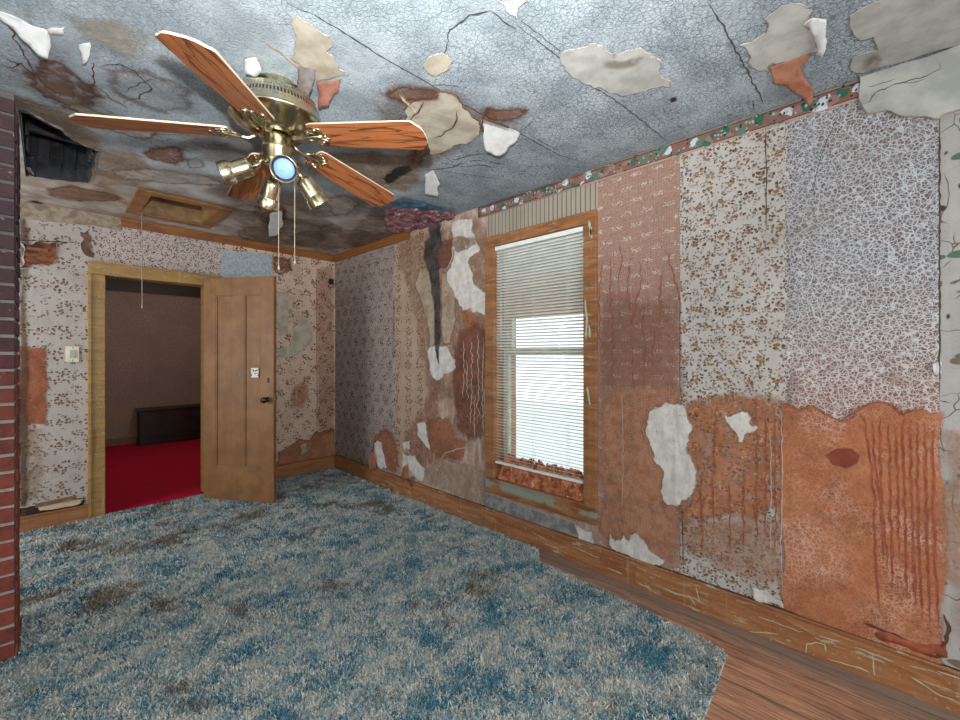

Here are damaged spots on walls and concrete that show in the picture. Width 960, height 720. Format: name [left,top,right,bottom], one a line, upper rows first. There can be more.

peeling [0,11,64,60]
damp [15,59,226,204]
crack [287,3,591,165]
peeling [390,82,520,157]
crack [589,85,668,142]
crack [707,1,763,111]
peeling [739,3,827,106]
peeling [849,0,960,120]
damp [415,267,456,364]
peeling [435,219,485,315]
peeling [645,402,697,507]
damp [728,401,937,595]